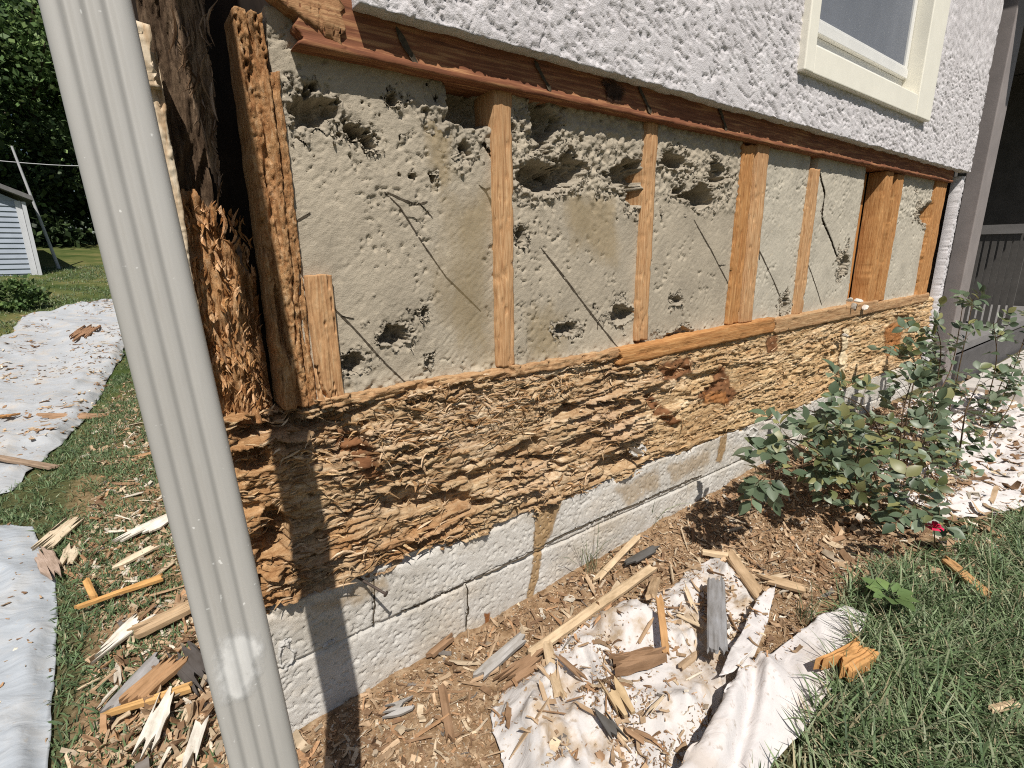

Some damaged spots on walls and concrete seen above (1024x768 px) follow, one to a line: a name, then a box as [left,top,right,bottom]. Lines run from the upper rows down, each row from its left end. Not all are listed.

spalling [281,73,385,158]
spalling [382,79,491,175]
spalling [511,99,736,221]
spalling [513,223,531,248]
crack [820,173,845,277]
spalling [911,191,932,231]
spalling [835,240,851,285]
spalling [340,303,436,377]
spalling [548,291,635,344]
spalling [648,290,701,340]
spalling [777,286,793,317]
leakage [527,547,542,598]